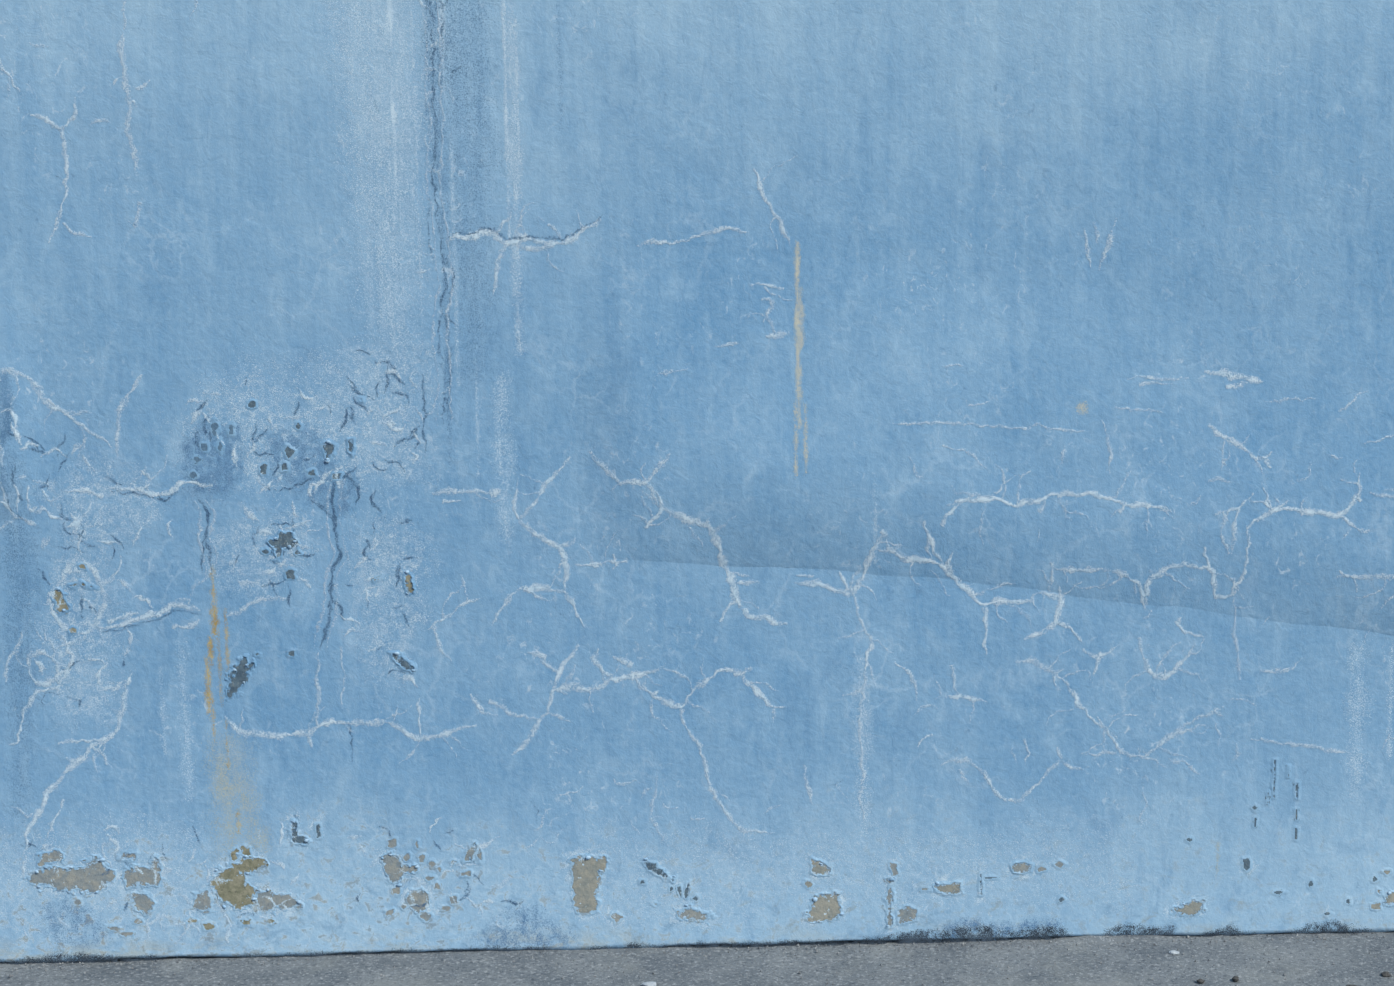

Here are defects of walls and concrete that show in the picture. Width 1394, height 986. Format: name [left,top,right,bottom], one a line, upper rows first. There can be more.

corrosion [792,240,809,479]
spalling [256,419,358,483]
crack [0,0,798,878]
crack [795,369,1394,824]
peeling [22,843,170,941]
crack [100,815,300,943]
peeling [183,842,309,933]
peeling [375,835,486,924]
crack [347,818,524,929]
peeling [560,846,631,932]
peeling [636,854,721,935]
peeling [800,850,850,933]